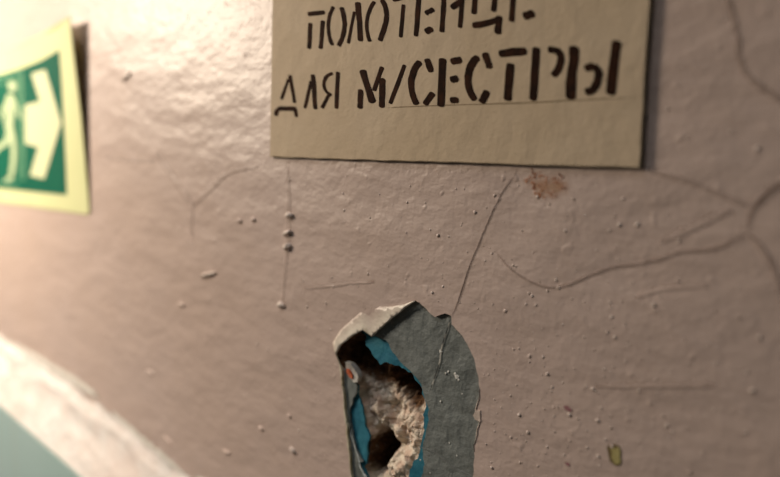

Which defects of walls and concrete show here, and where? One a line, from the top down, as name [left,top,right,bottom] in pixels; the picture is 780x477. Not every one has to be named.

crack [726,0,780,102]
crack [454,176,514,311]
crack [501,170,780,292]
peeling [333,301,481,477]